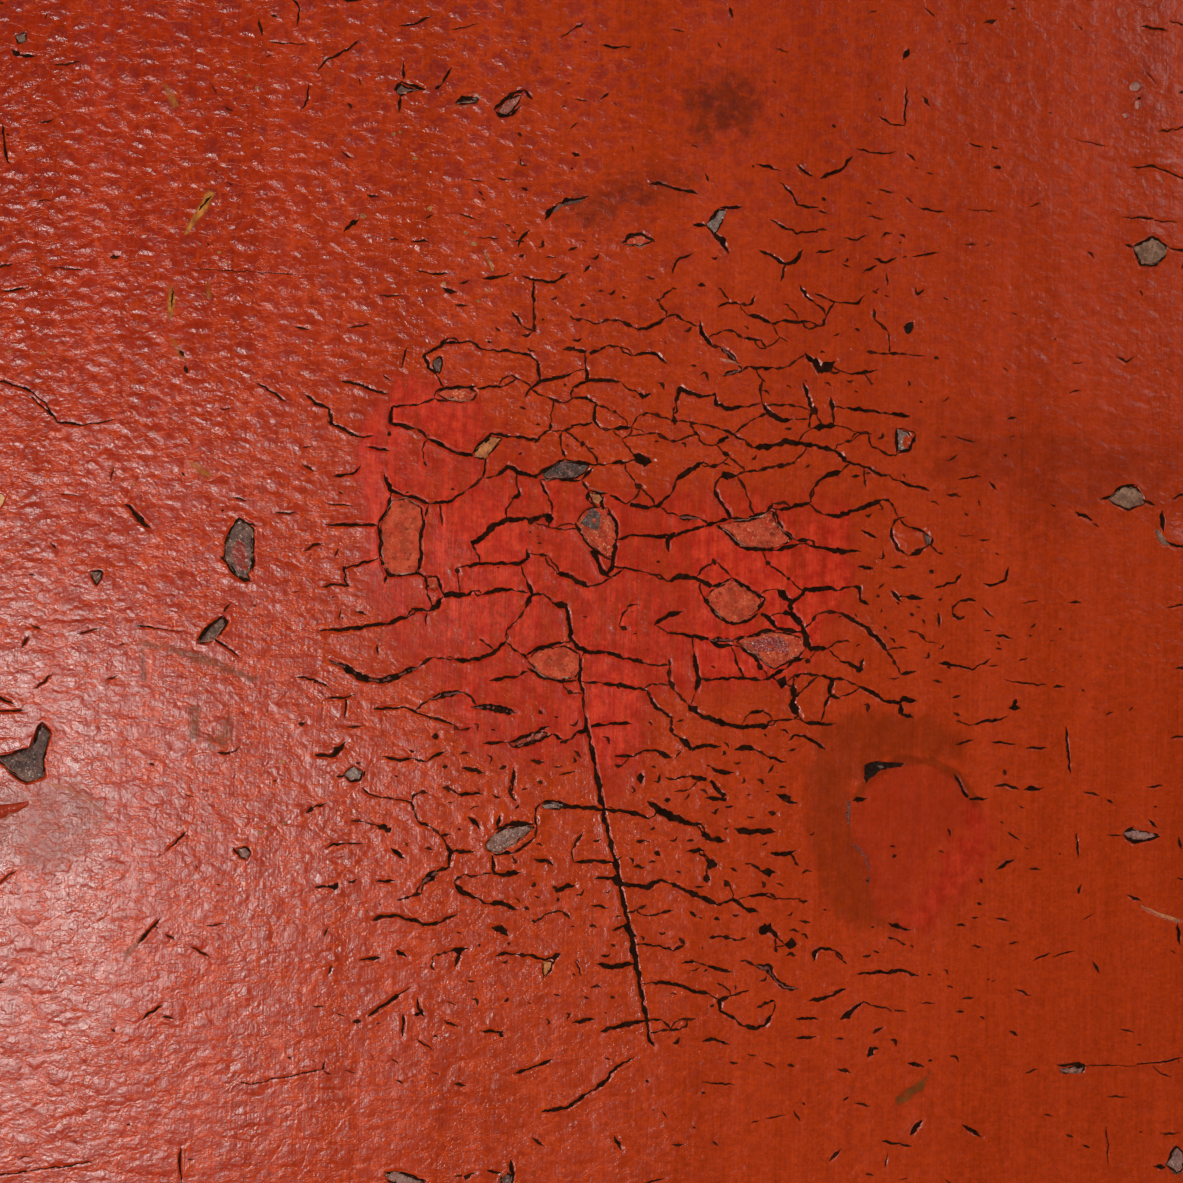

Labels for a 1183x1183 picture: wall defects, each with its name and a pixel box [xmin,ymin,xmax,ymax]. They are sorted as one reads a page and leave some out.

peeling [1125,236,1183,267]
crack [0,380,114,426]
peeling [1100,484,1156,511]
peeling [219,517,257,582]
peeling [325,472,466,624]
crack [240,49,1112,1148]
peeling [0,722,52,784]
peeling [485,800,566,856]
crack [142,1003,174,1020]
crack [0,1141,92,1176]
crack [178,1147,192,1181]
crack [866,1120,922,1180]